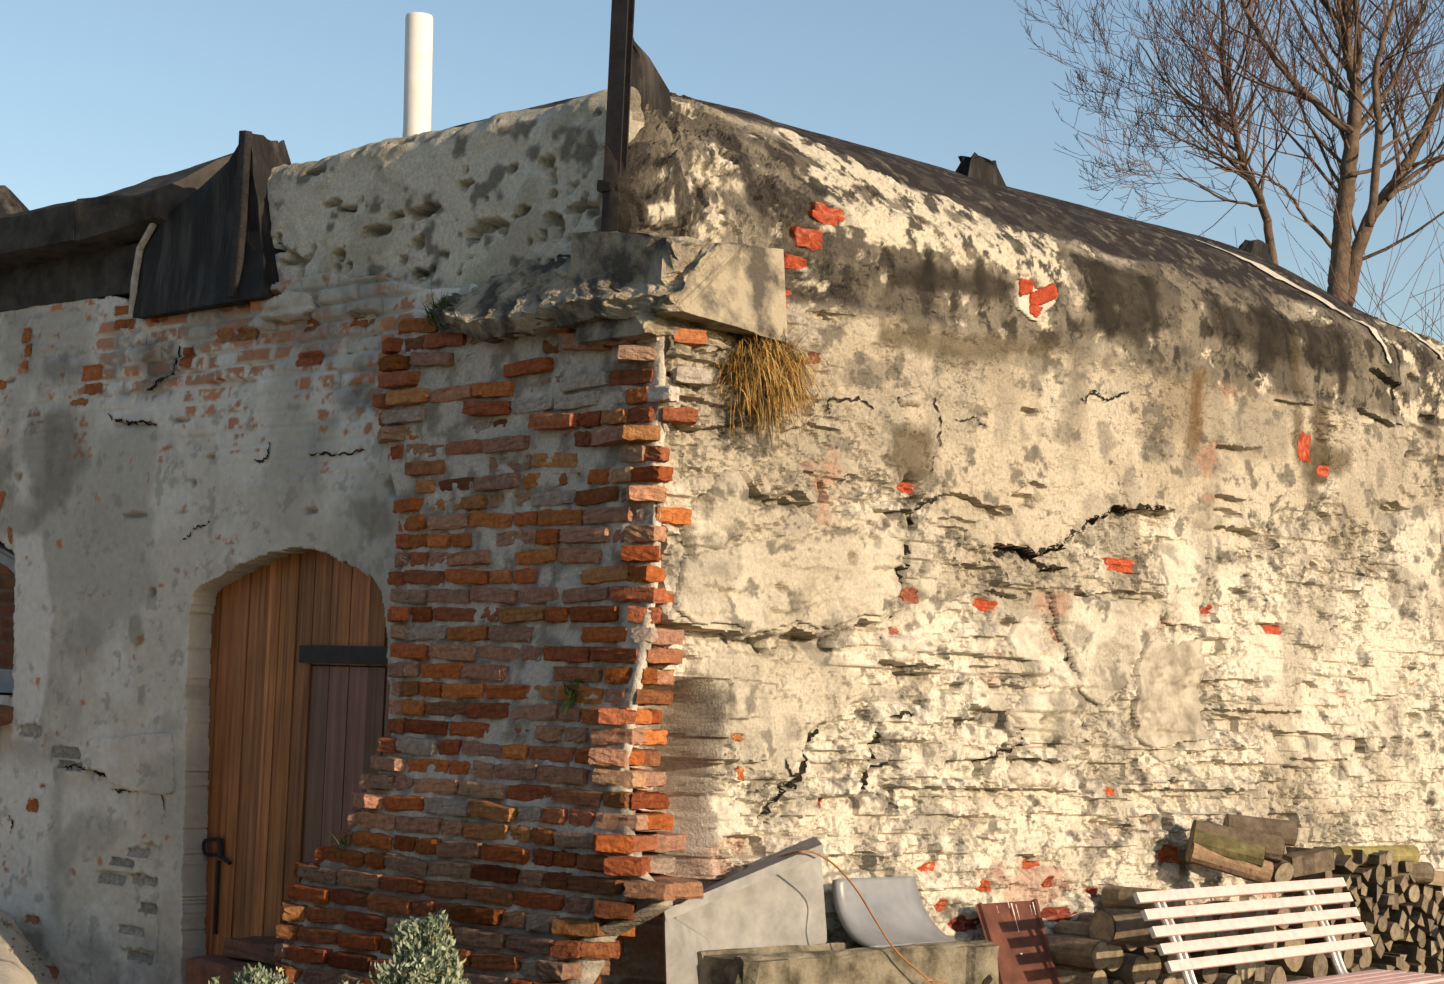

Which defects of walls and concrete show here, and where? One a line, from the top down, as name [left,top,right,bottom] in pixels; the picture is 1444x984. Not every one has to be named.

spalling [68,364,108,406]
spalling [177,288,326,373]
spalling [780,199,856,365]
damp [888,246,1011,302]
damp [882,326,1048,360]
spalling [1012,278,1058,321]
damp [1078,256,1160,348]
damp [1207,289,1349,483]
crack [993,503,1166,572]
flaking render [672,524,930,651]
crack [64,764,165,810]
crack [757,725,819,819]